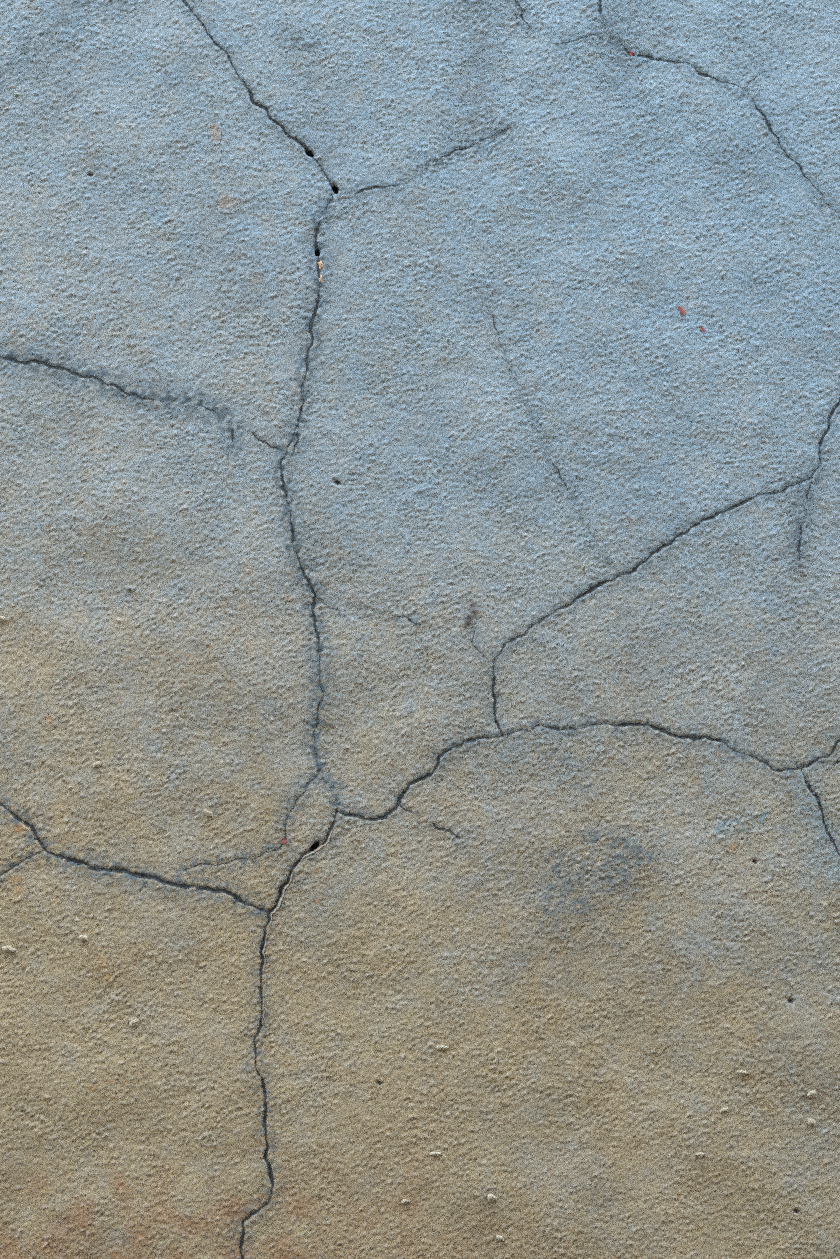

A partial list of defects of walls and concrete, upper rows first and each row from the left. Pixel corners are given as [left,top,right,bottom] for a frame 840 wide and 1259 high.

crack [356,126,512,193]
crack [558,0,823,195]
crack [1,357,216,410]
crack [183,0,334,870]
crack [0,399,840,1259]